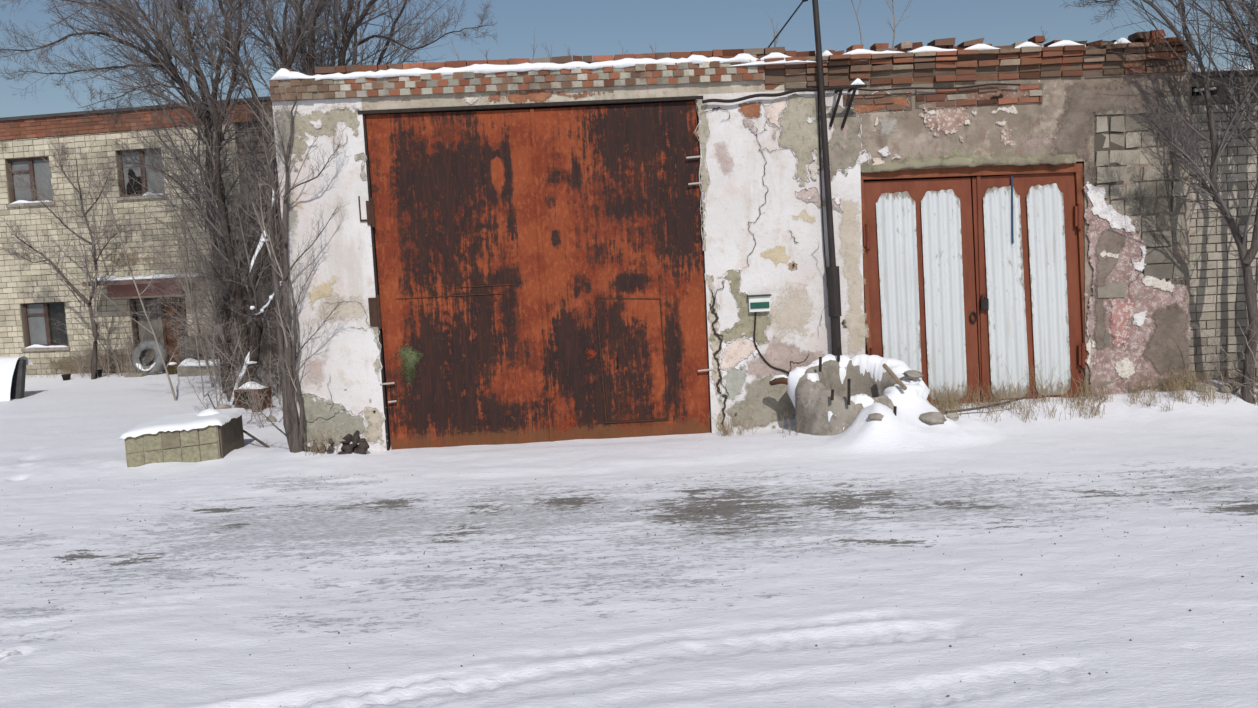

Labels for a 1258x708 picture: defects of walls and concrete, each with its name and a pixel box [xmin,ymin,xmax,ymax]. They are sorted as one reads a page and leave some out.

peeling [289,105,360,171]
spalling [354,152,367,181]
spalling [695,99,711,251]
crack [700,107,827,376]
peeling [737,80,1042,213]
peeling [1084,91,1193,396]
spalling [372,326,382,380]
crack [709,283,729,429]
flaking render [705,268,796,433]